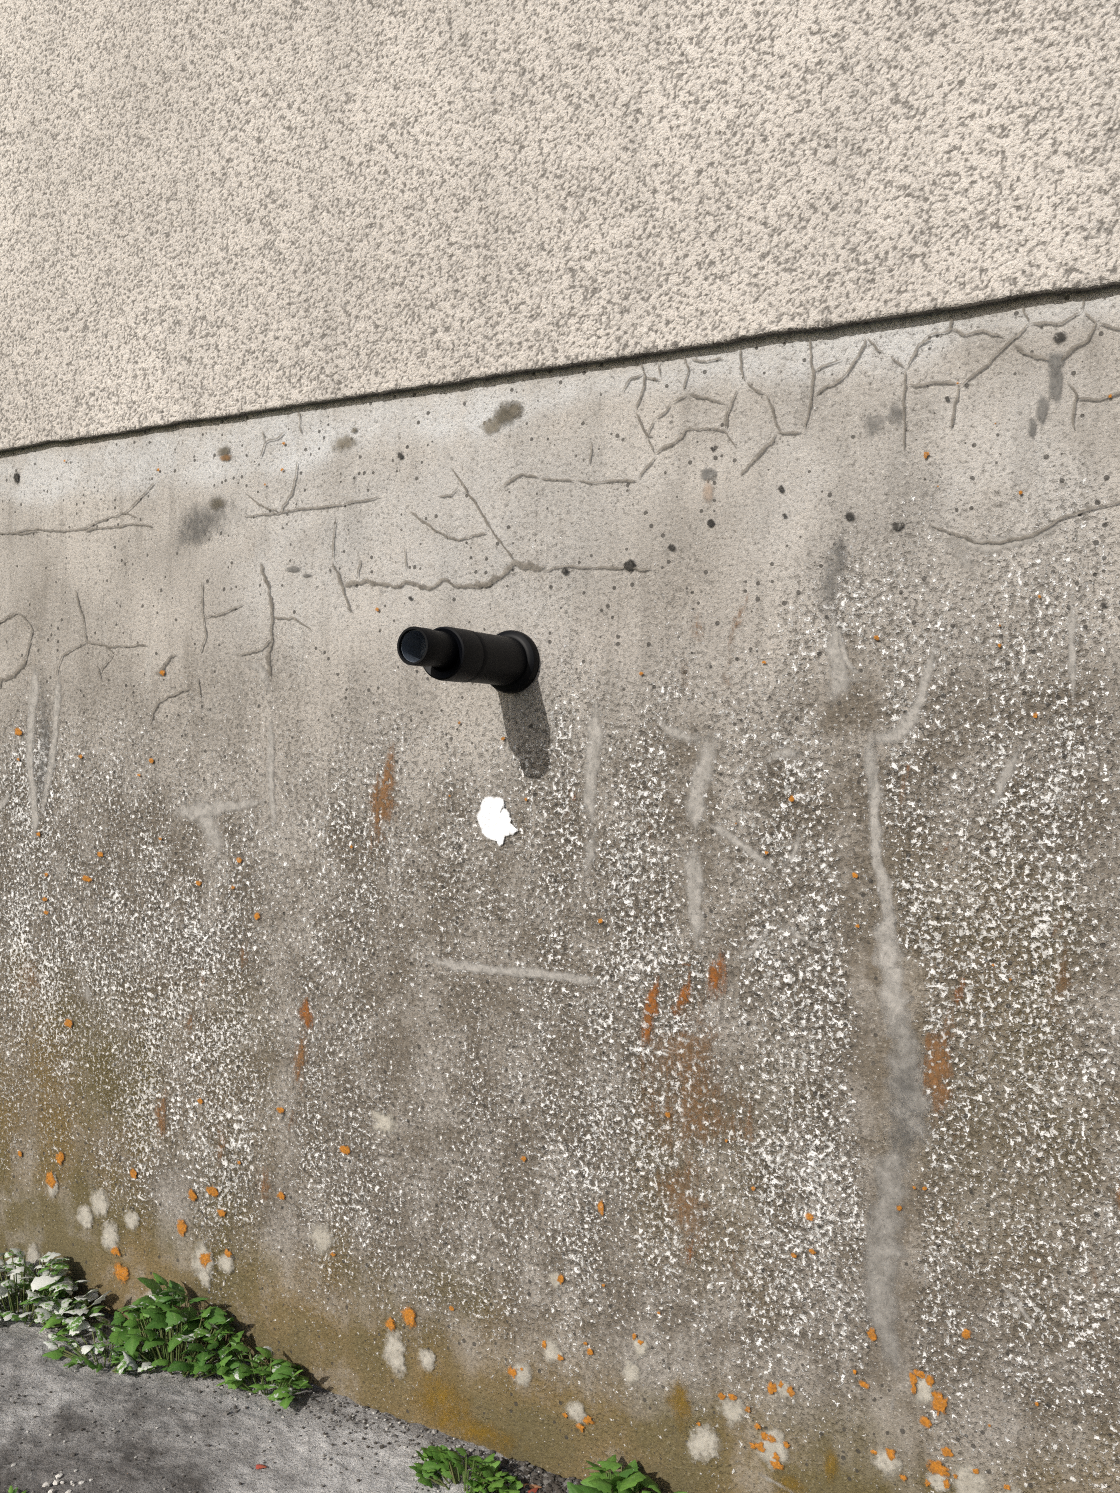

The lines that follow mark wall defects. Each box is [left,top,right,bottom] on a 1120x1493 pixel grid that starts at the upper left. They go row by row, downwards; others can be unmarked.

crack [244,296,1120,611]
crack [0,484,153,535]
crack [0,563,310,723]
leakage [826,620,857,696]
rust [373,753,393,834]
leakage [431,959,595,984]
leakage [864,645,935,1369]